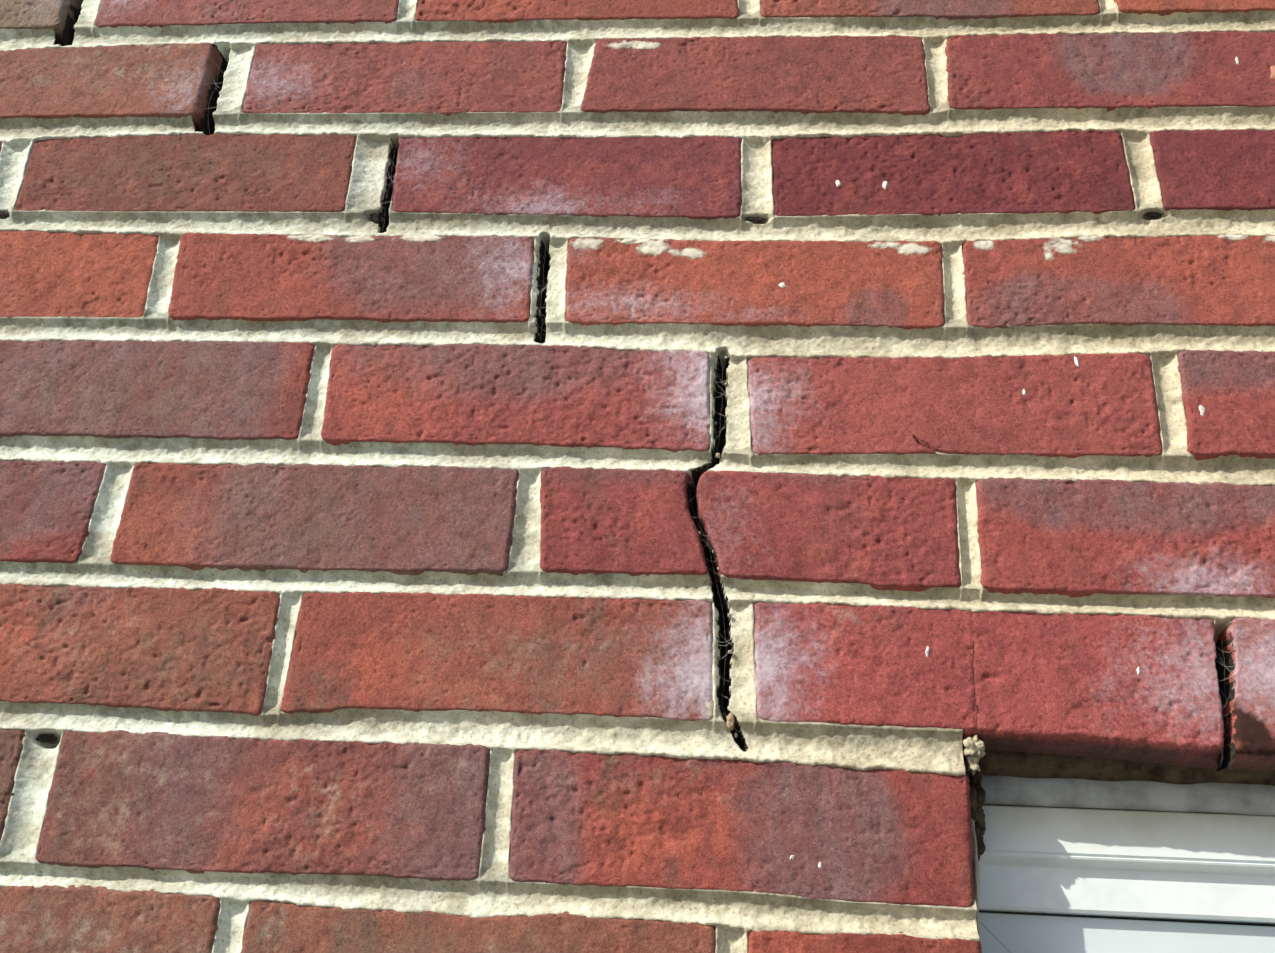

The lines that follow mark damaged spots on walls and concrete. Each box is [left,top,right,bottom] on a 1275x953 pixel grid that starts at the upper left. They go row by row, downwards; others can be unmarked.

crack [61,5,82,46]
crack [201,45,228,135]
crack [378,139,398,233]
crack [534,237,551,344]
crack [687,350,748,752]
crack [1215,633,1236,772]